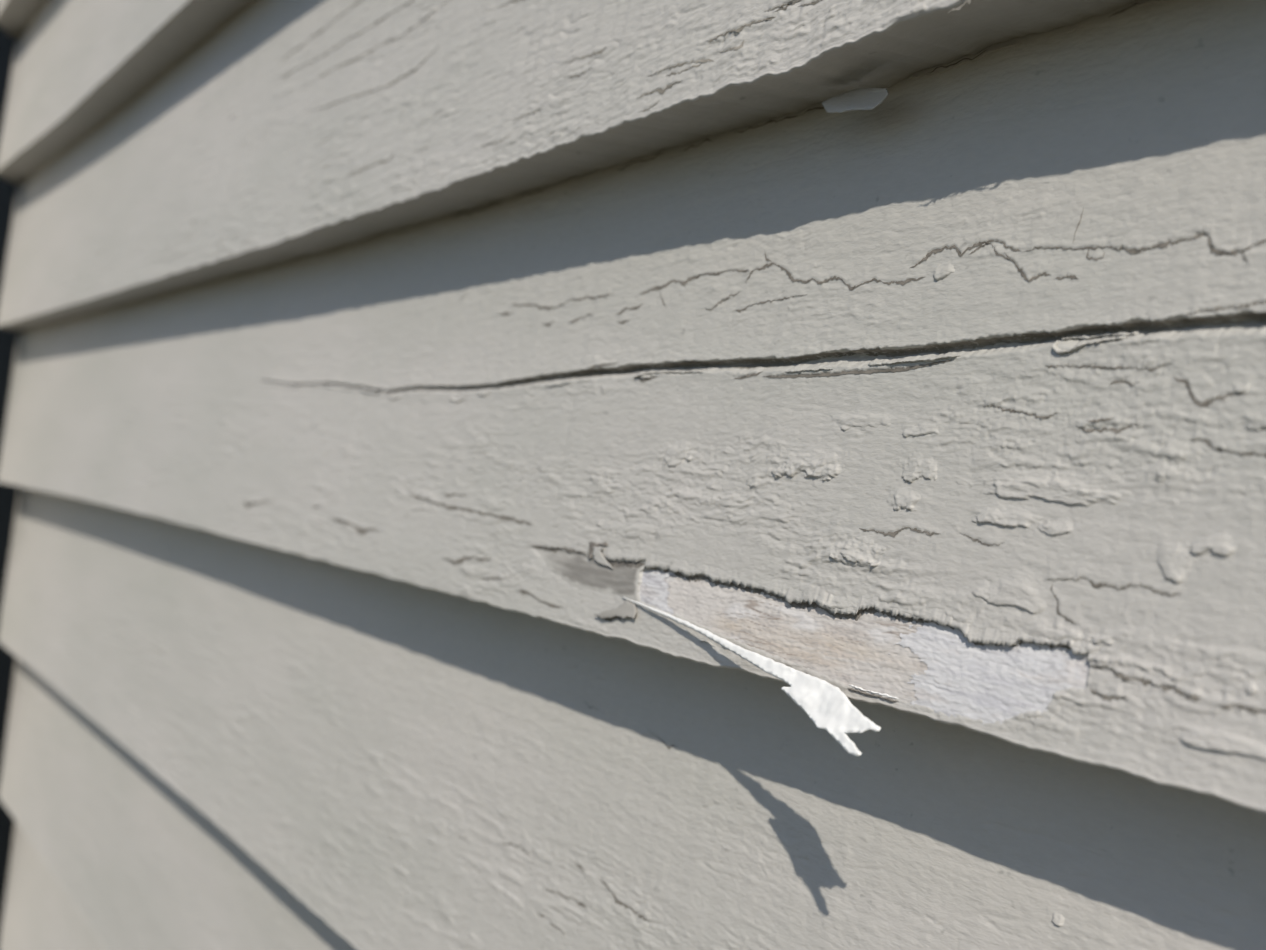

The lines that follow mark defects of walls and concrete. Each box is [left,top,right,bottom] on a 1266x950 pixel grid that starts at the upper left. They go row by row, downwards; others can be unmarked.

crack [616,107,824,171]
crack [499,206,1266,326]
crack [270,302,1266,407]
crack [981,405,1141,433]
crack [1190,439,1266,457]
peeling [534,542,1090,756]